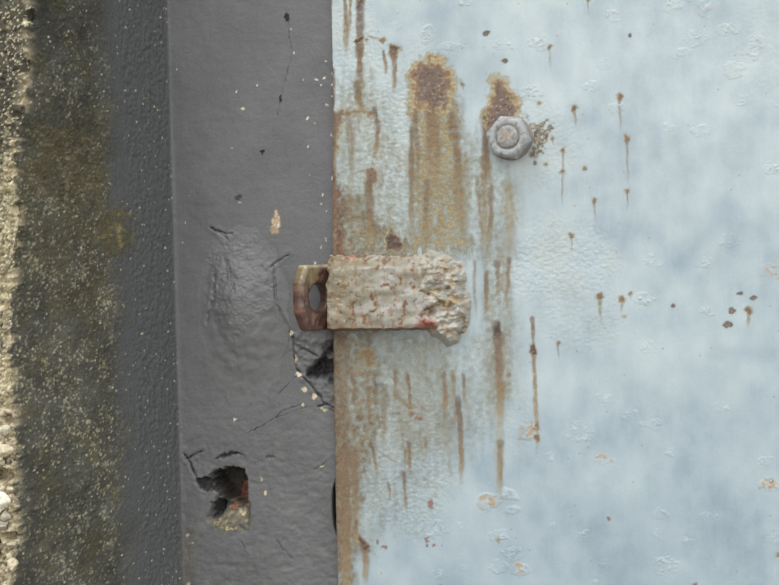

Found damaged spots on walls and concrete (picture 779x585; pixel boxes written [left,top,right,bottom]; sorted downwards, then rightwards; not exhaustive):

corrosion [332,0,473,258]
corrosion [480,73,522,243]
hole [198,466,251,531]
crack [249,330,332,432]
corrosion [333,330,465,585]
corrosion [484,248,510,411]
corrosion [529,318,540,441]